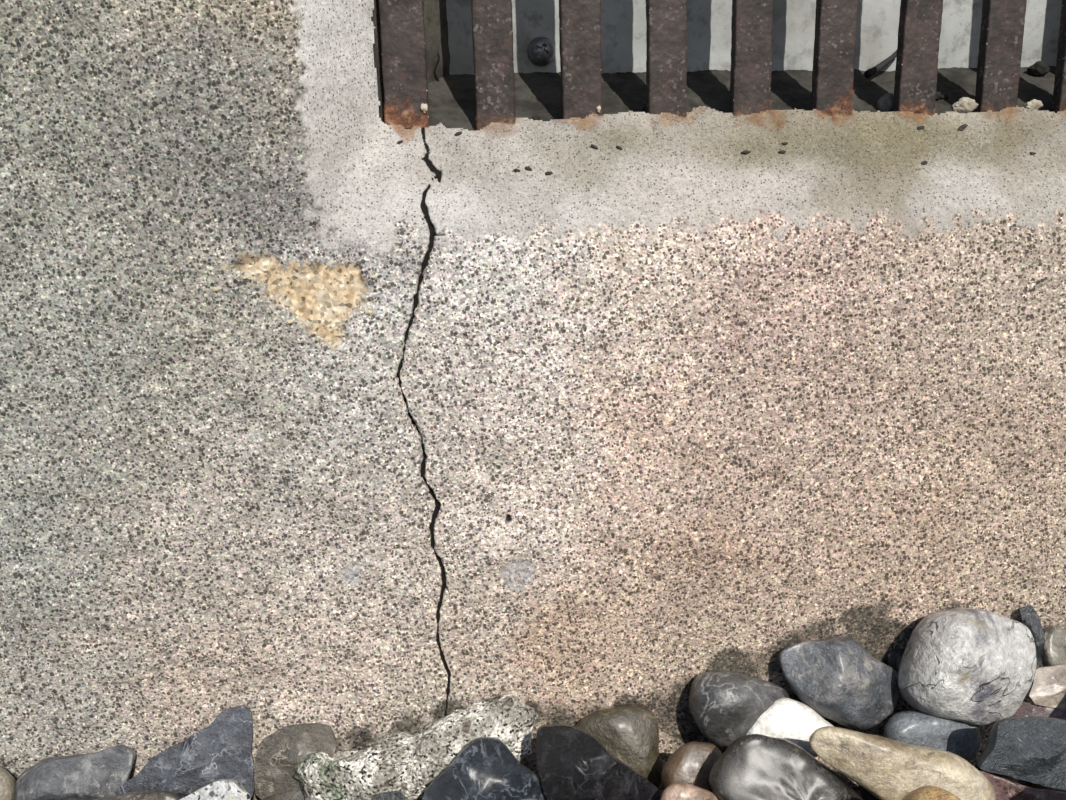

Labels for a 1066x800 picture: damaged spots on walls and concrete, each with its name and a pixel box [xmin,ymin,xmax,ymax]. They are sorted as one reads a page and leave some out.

rust [385,101,428,136]
spalling [221,253,378,350]
crack [396,128,450,716]